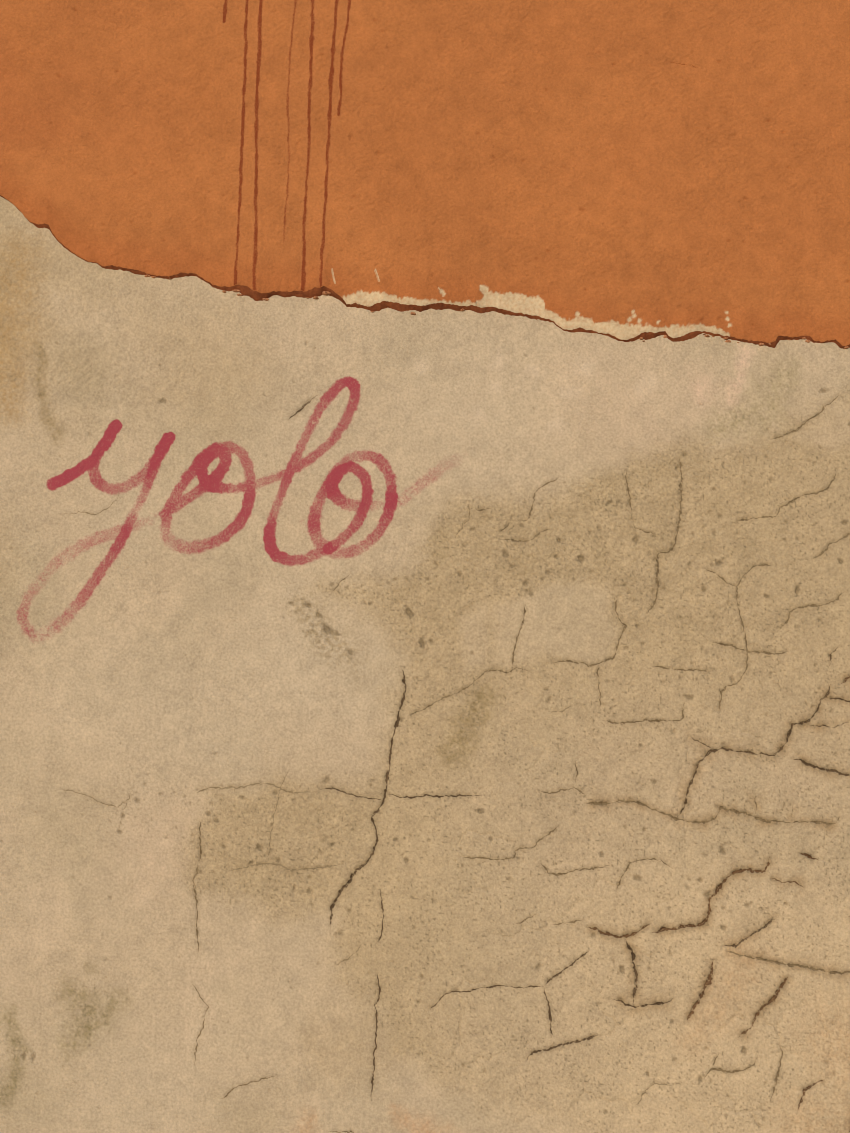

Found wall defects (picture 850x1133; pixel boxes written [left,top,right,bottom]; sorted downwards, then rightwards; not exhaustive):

flaking render [0,195,74,254]
crack [773,396,838,439]
flaking render [0,237,850,1133]
crack [197,459,850,924]
crack [192,821,202,950]
crack [192,984,209,1057]
crack [222,1076,274,1099]
crack [337,890,384,965]
crack [371,975,381,1101]
crack [431,853,850,1109]